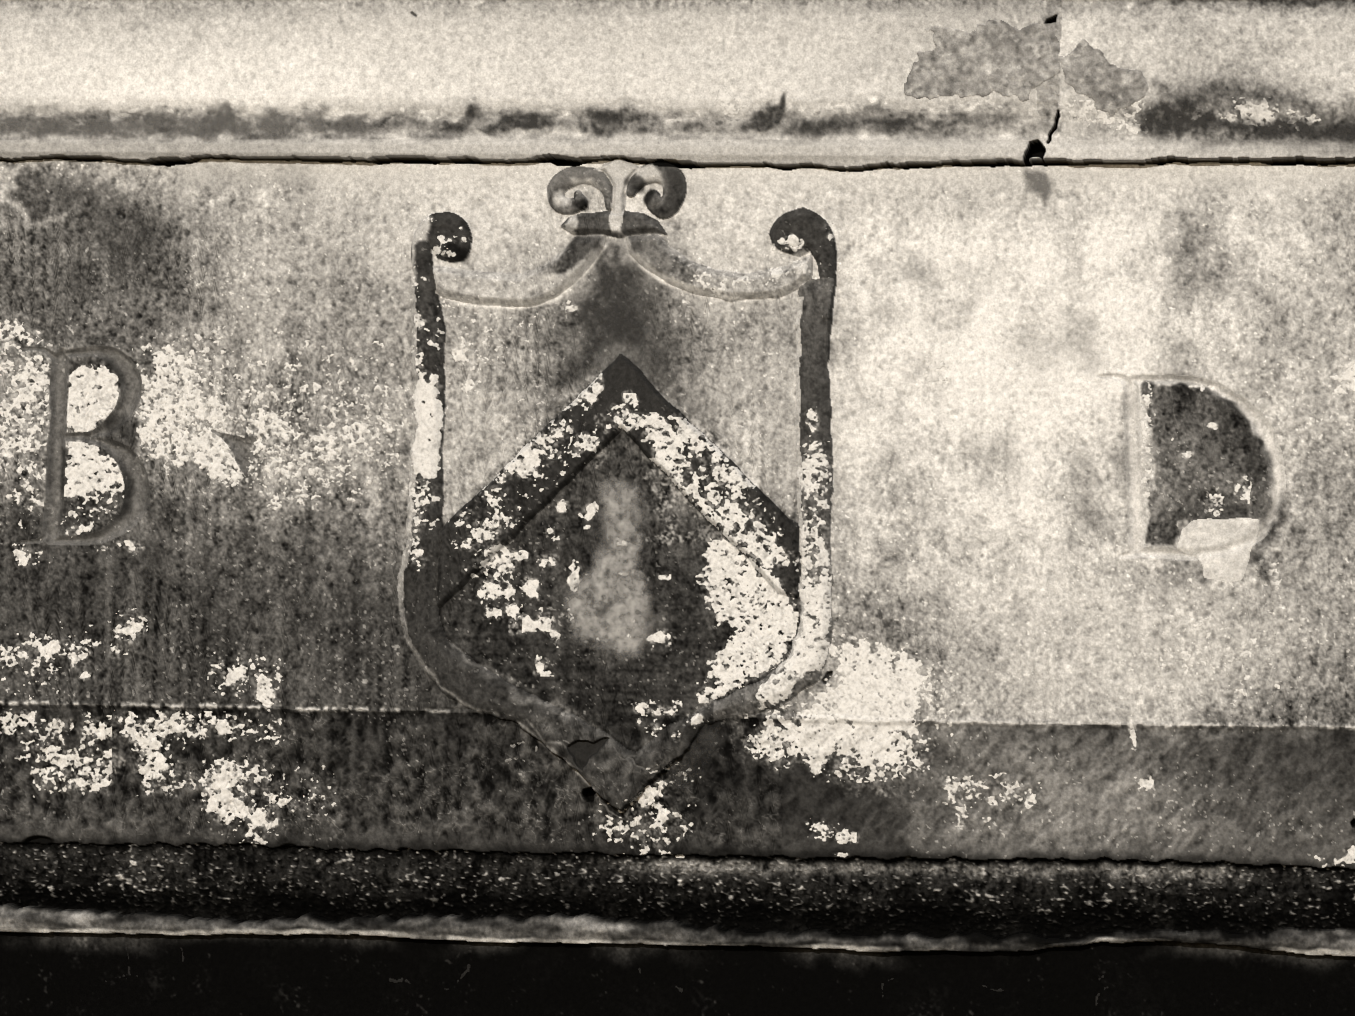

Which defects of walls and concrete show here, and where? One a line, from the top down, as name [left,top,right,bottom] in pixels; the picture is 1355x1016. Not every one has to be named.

peeling [904,20,1151,136]
damp [581,245,641,341]
damp [568,484,648,653]